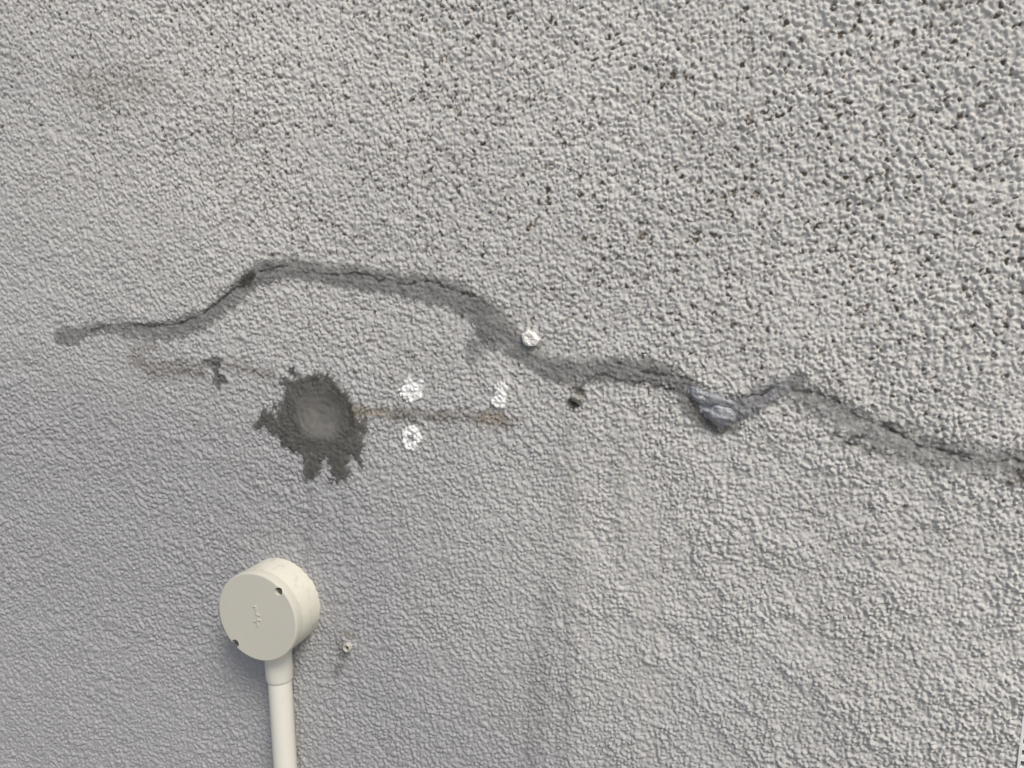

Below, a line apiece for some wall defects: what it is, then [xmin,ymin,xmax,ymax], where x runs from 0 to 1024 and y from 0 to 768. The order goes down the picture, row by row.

crack [55,255,708,395]
crack [732,373,1024,482]